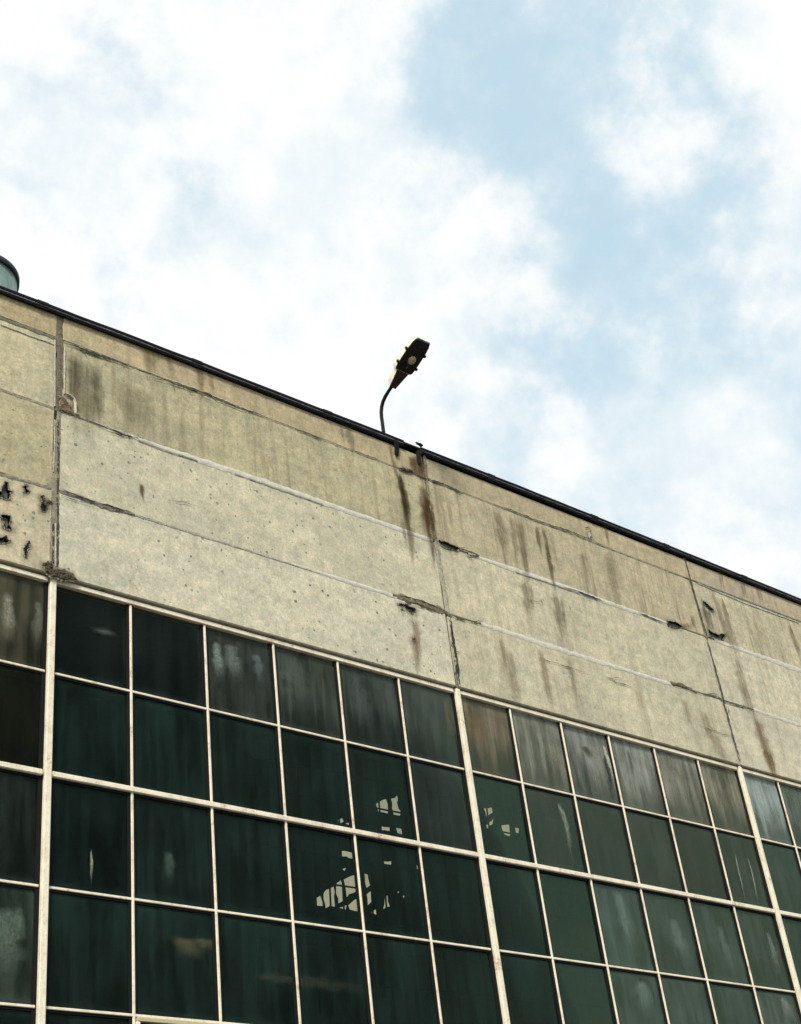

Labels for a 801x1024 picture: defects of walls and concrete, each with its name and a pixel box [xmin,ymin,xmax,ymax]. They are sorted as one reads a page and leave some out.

spalling [0,480,54,513]
corrosion [395,458,434,531]
crack [414,472,463,494]
spalling [0,514,12,544]
crack [672,559,754,756]